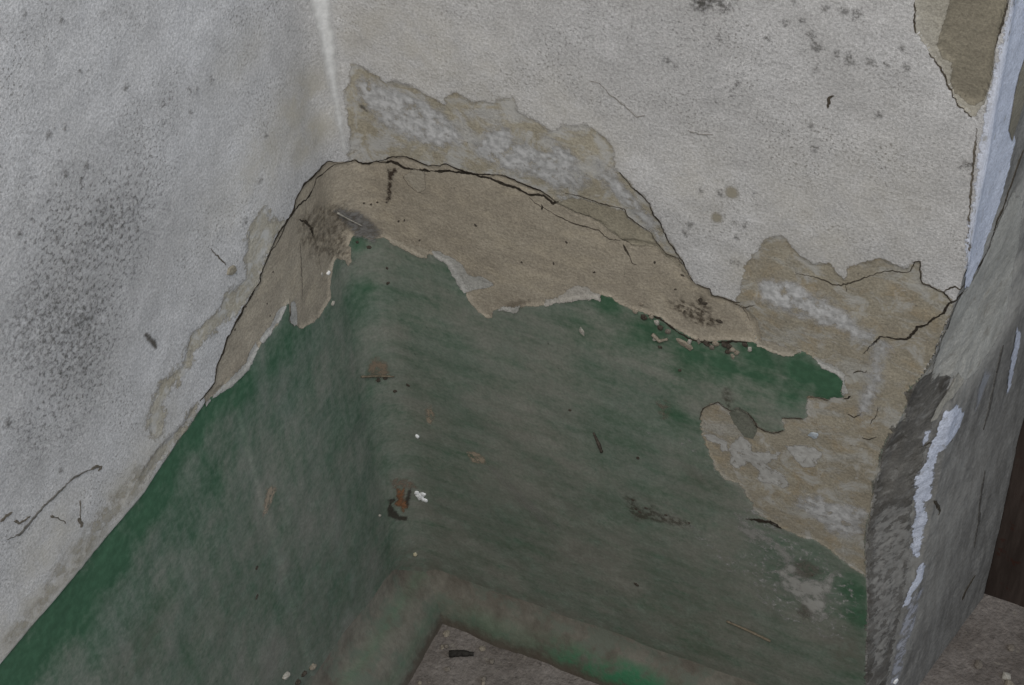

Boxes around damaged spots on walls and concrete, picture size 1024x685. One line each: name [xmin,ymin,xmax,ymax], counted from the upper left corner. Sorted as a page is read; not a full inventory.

peeling [914,0,1008,117]
crack [200,156,753,401]
spalling [73,64,964,685]
crack [699,0,1024,440]
rust [388,478,416,520]